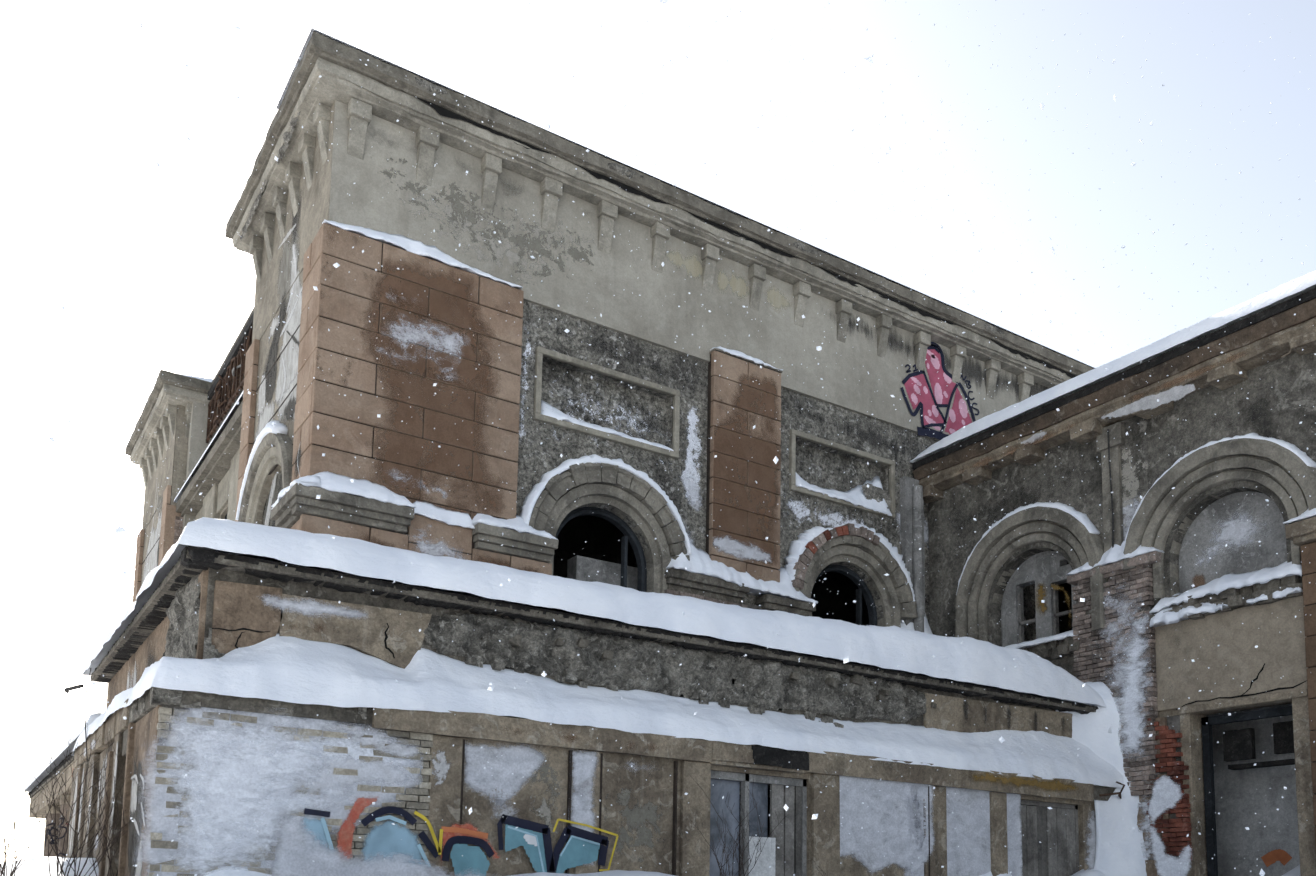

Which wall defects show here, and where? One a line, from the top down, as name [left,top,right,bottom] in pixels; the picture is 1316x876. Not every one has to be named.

peeling [382,158,595,284]
damp [366,263,502,517]
spalling [165,574,225,659]
spalling [423,612,937,728]
flaking render [665,589,763,610]
flaking render [1144,715,1192,860]